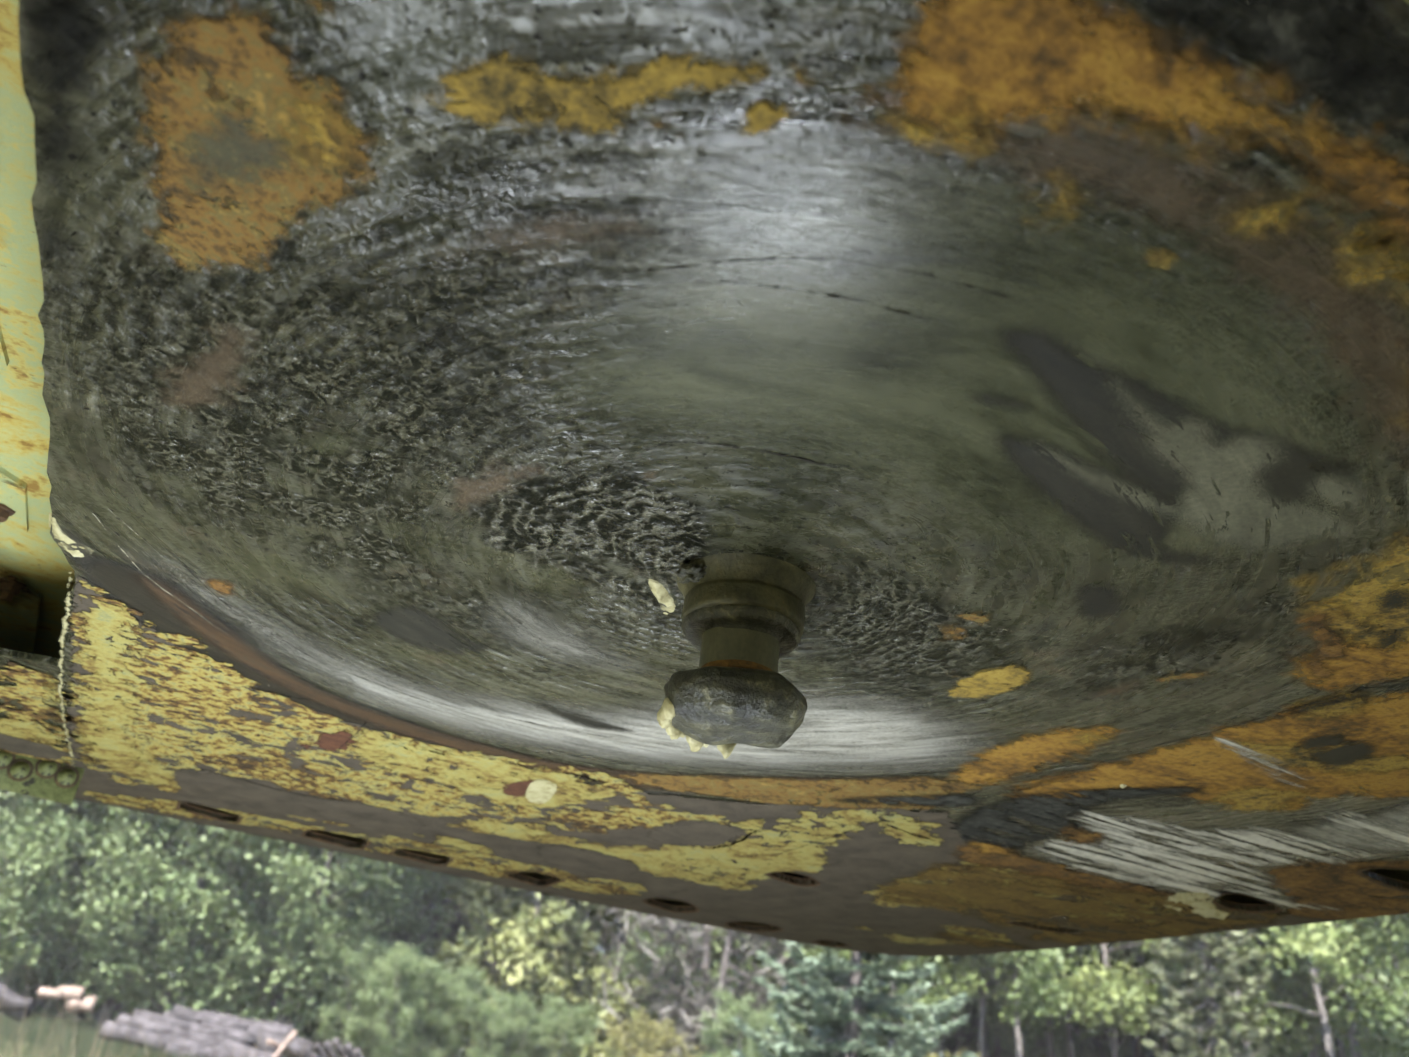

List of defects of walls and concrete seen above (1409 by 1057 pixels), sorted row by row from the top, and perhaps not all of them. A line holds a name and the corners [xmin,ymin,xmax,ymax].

rust [136,4,376,272]
rust [429,51,768,133]
rust [743,100,789,135]
rust [868,0,1409,285]
peeling [0,580,951,896]
rust [133,534,1409,812]
rust [1060,827,1104,844]
rust [881,843,1409,949]